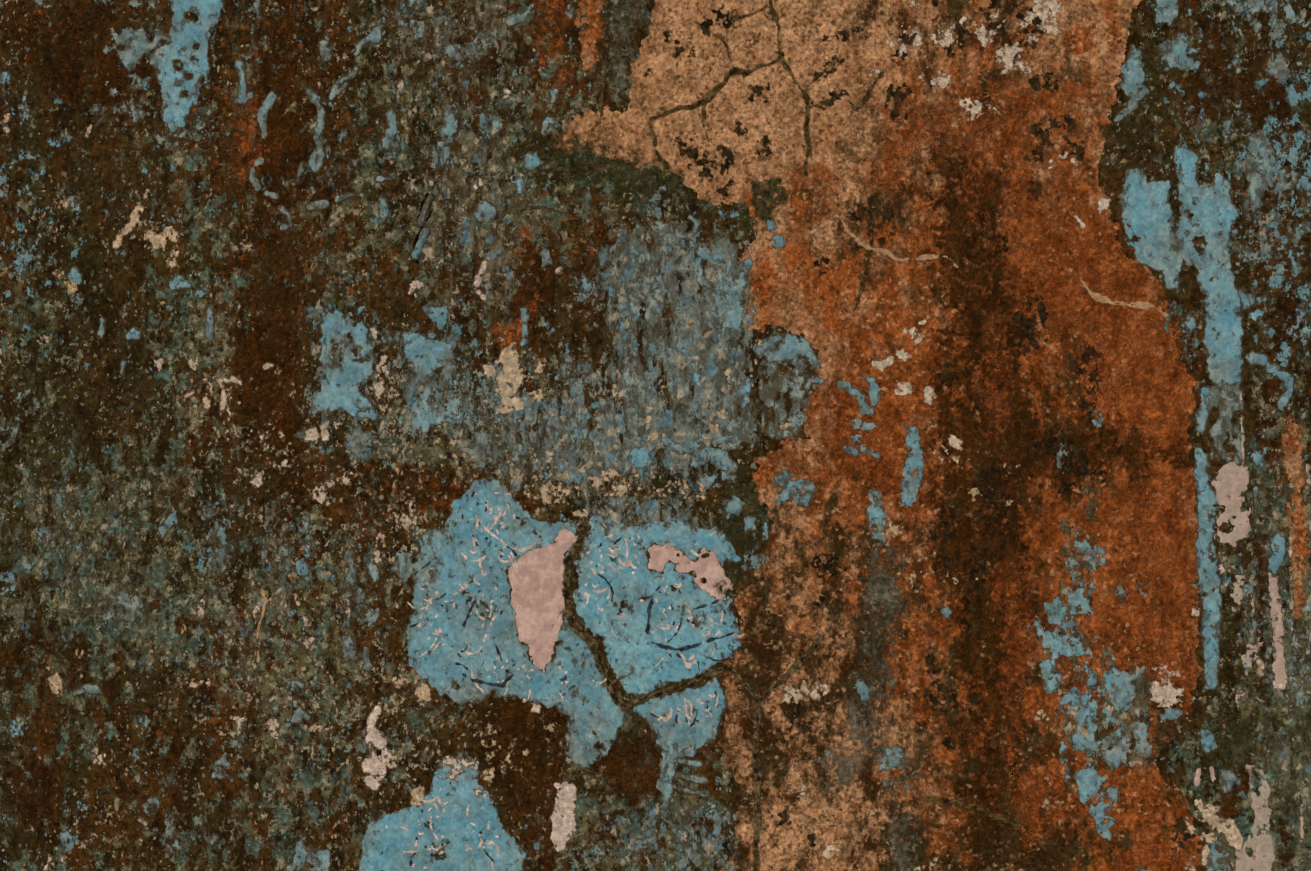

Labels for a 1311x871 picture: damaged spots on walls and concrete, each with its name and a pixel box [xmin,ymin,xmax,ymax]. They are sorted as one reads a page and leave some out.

rust [230,94,282,179]
crack [506,206,558,214]
crack [531,0,958,311]
rust [875,71,1191,450]
flaking render [338,0,1311,871]
rust [780,369,906,505]
peeling [251,510,312,626]
rust [1109,471,1199,683]
crack [560,517,840,871]
rust [991,562,1054,848]
peeling [283,839,331,871]
rust [1112,838,1202,871]